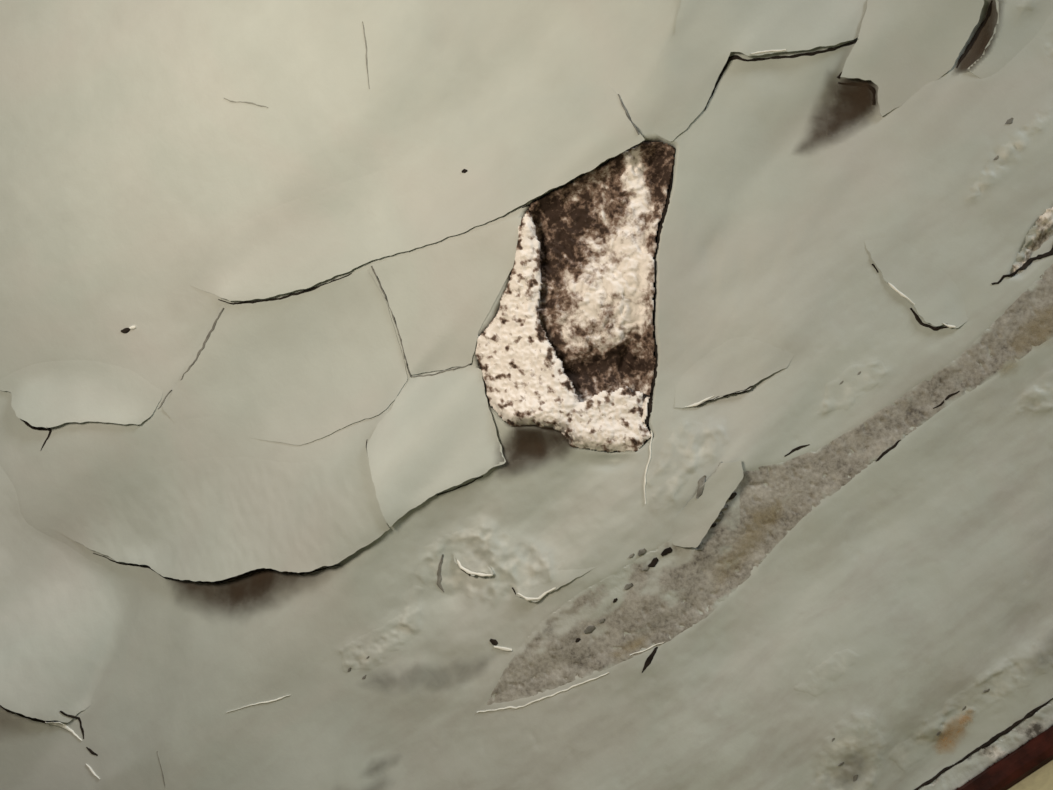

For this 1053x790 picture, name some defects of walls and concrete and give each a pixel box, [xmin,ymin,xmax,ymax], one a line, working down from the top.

crack [158,308,224,409]
crack [371,266,471,377]
spalling [0,0,1053,583]
crack [693,386,753,407]
crack [933,391,960,409]
spalling [487,207,1053,705]
crack [785,444,810,456]
crack [876,440,901,461]
peeling [0,466,137,729]
crack [436,554,444,592]
crack [642,647,658,673]
spalling [920,702,1053,790]